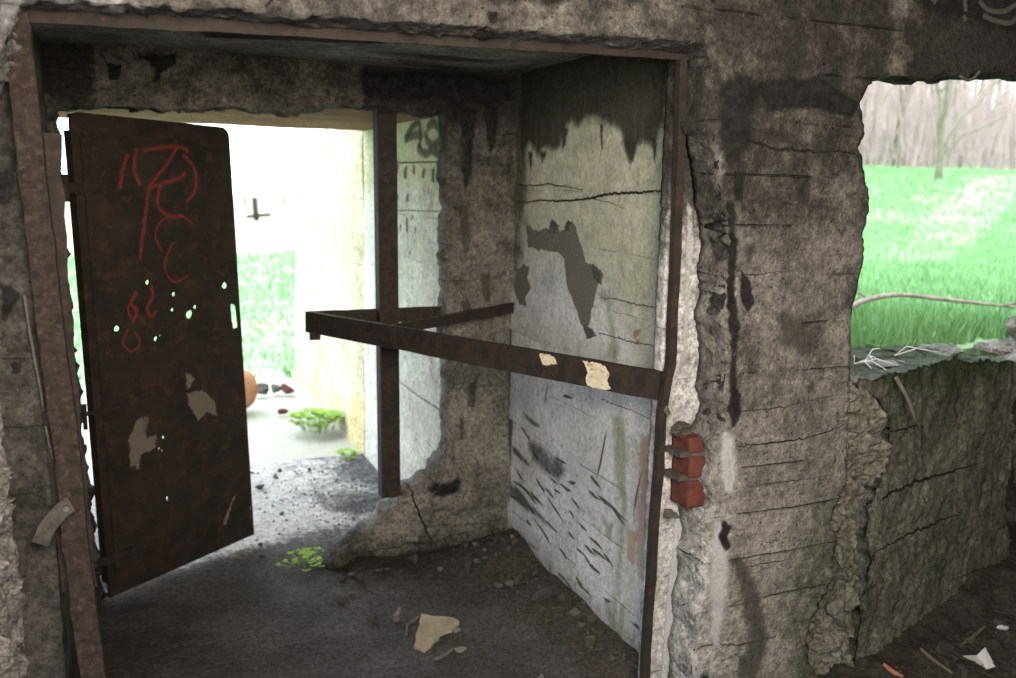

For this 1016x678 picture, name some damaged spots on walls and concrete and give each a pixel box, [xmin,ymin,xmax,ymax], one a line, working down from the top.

crack [514,183,661,209]
peeling [514,264,531,307]
peeling [527,219,611,390]
spalling [705,236,729,333]
spalling [701,348,727,437]
spalling [0,409,28,678]
flaking render [663,420,713,599]
spalling [806,379,893,675]